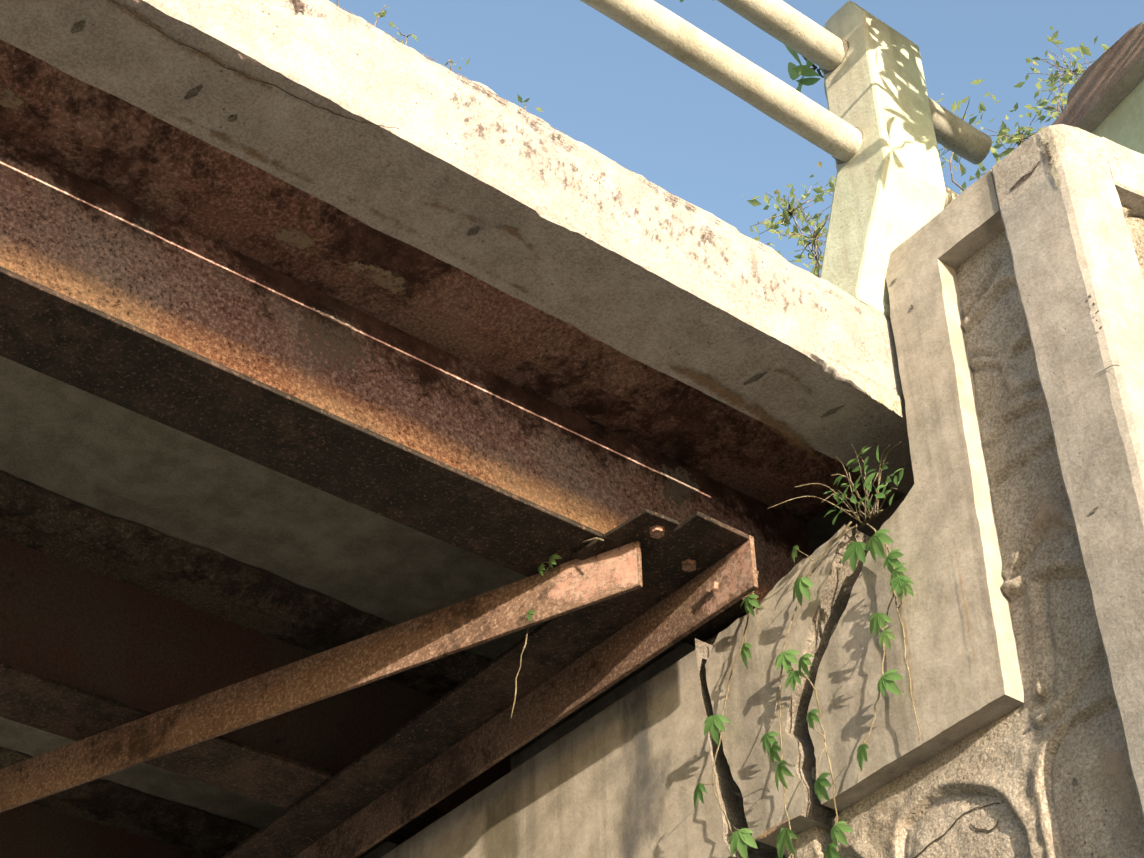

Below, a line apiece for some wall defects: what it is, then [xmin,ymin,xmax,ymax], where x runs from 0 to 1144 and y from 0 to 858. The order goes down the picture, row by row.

crack [154,28,399,129]
rust [673,367,818,458]
crack [861,536,871,558]
crack [842,583,855,598]
water stain [623,686,665,858]
crack [809,740,817,781]
crack [747,842,786,858]
crack [914,803,1000,858]